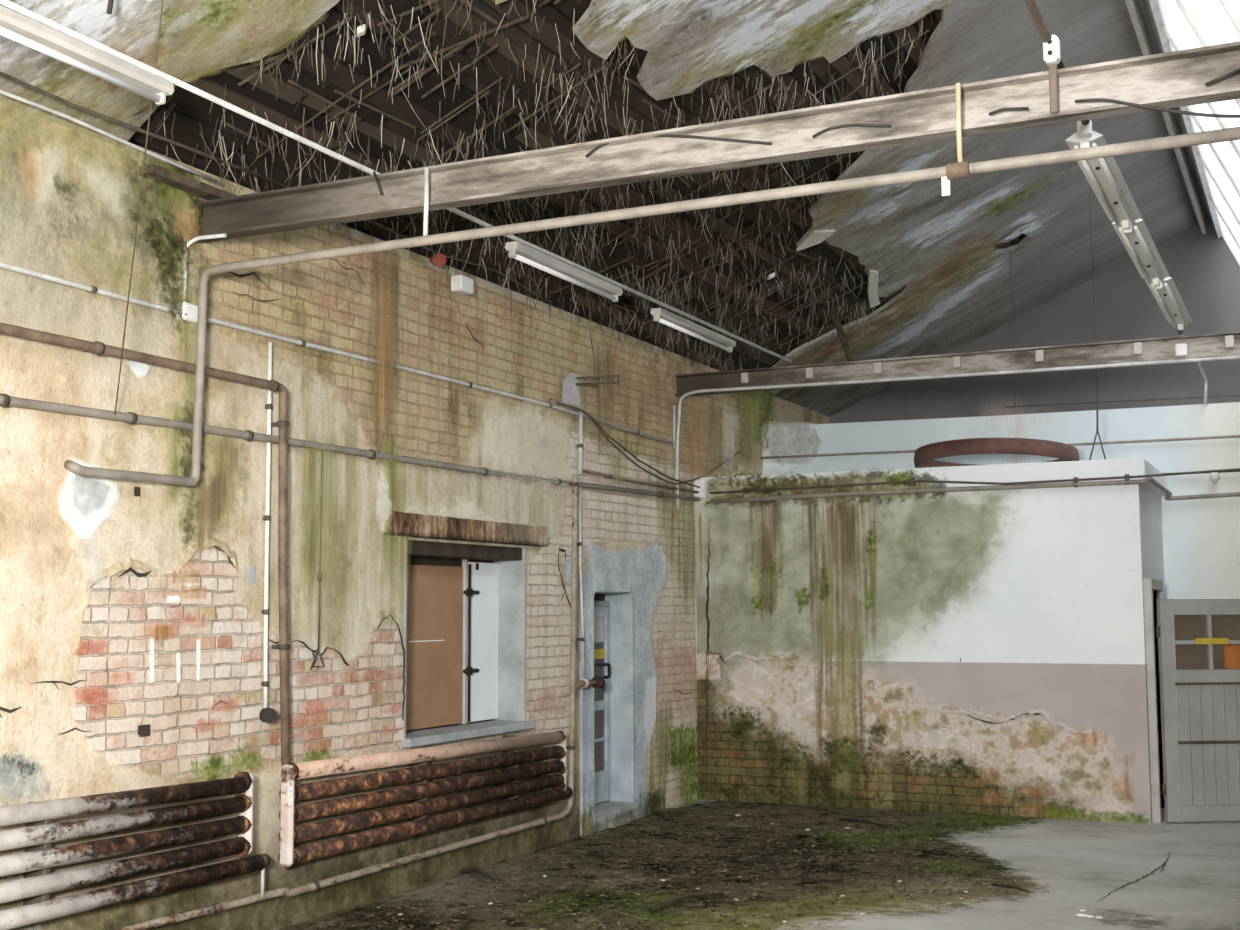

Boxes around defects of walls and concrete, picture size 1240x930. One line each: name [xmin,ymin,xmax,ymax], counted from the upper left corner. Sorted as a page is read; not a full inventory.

peeling [30,0,135,41]
peeling [610,0,691,23]
peeling [708,0,832,68]
peeling [847,0,931,33]
peeling [904,186,1012,247]
water stain [125,157,207,362]
water stain [172,394,237,547]
flaking render [198,226,1128,822]
water stain [695,424,996,787]
spalling [72,536,405,780]
crack [0,680,86,717]
crack [1097,851,1172,902]